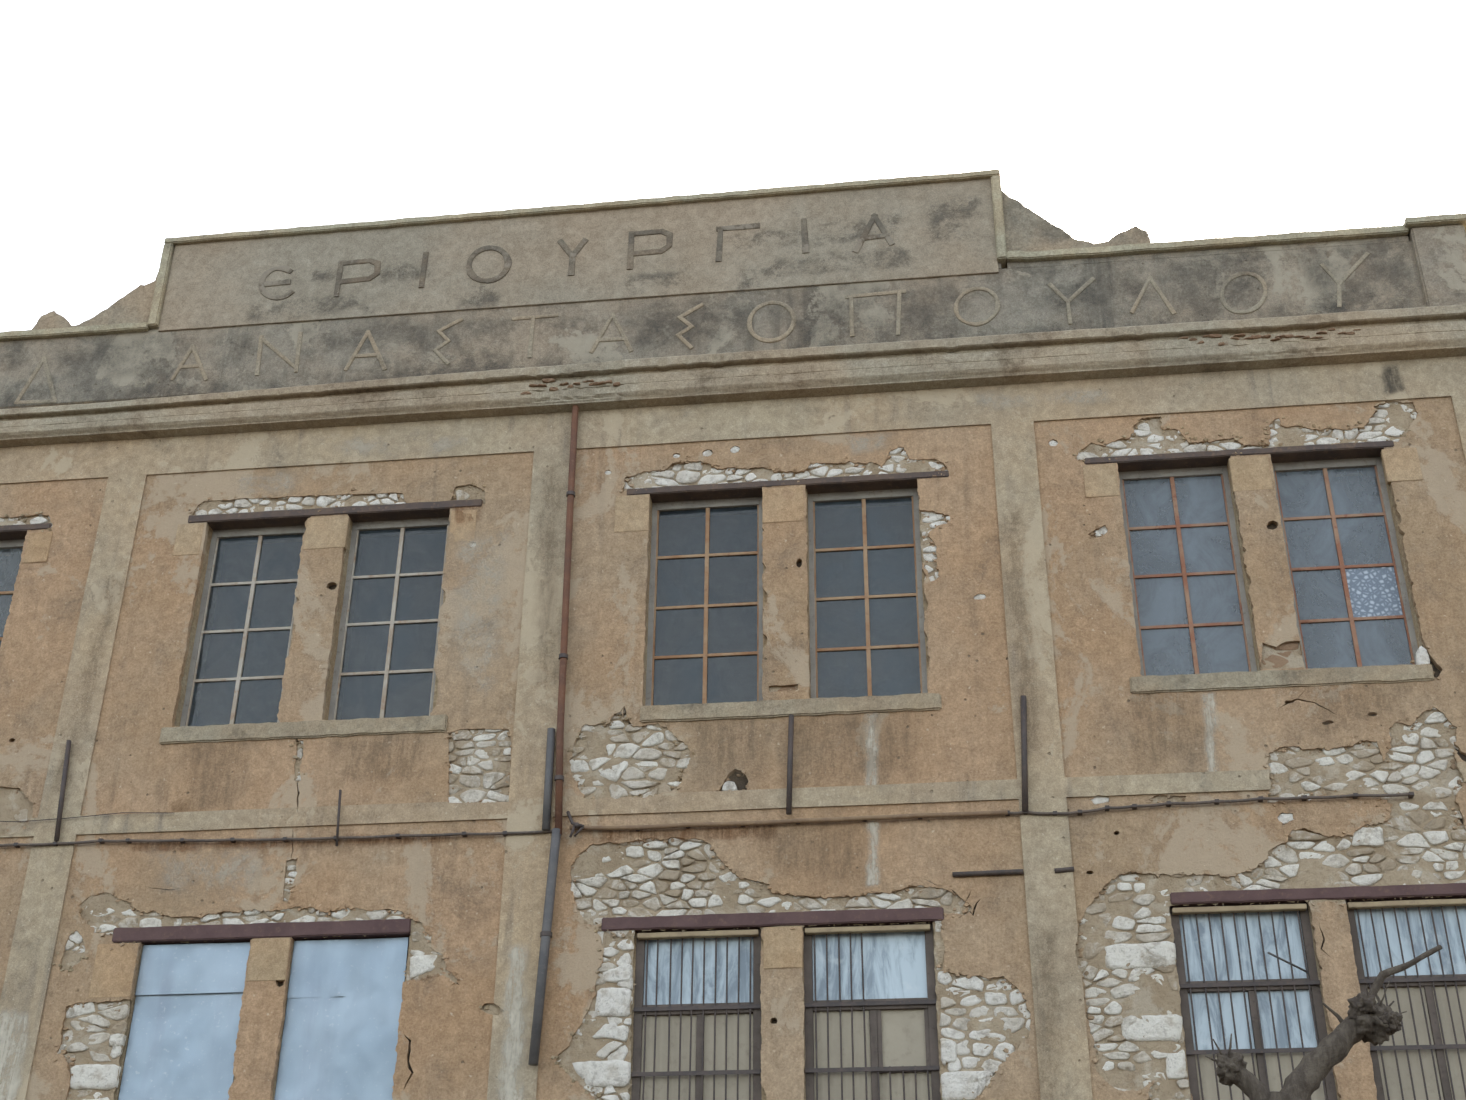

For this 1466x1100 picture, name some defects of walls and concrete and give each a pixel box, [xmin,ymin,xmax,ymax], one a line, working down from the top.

flaking render [0,511,53,532]
flaking render [189,487,406,515]
flaking render [605,445,948,493]
flaking render [920,512,953,581]
flaking render [1072,401,1418,462]
flaking render [443,728,512,803]
flaking render [564,710,695,800]
flaking render [52,857,460,985]
flaking render [1075,706,1466,1100]
flaking render [551,835,1034,1100]
flaking render [52,998,131,1100]